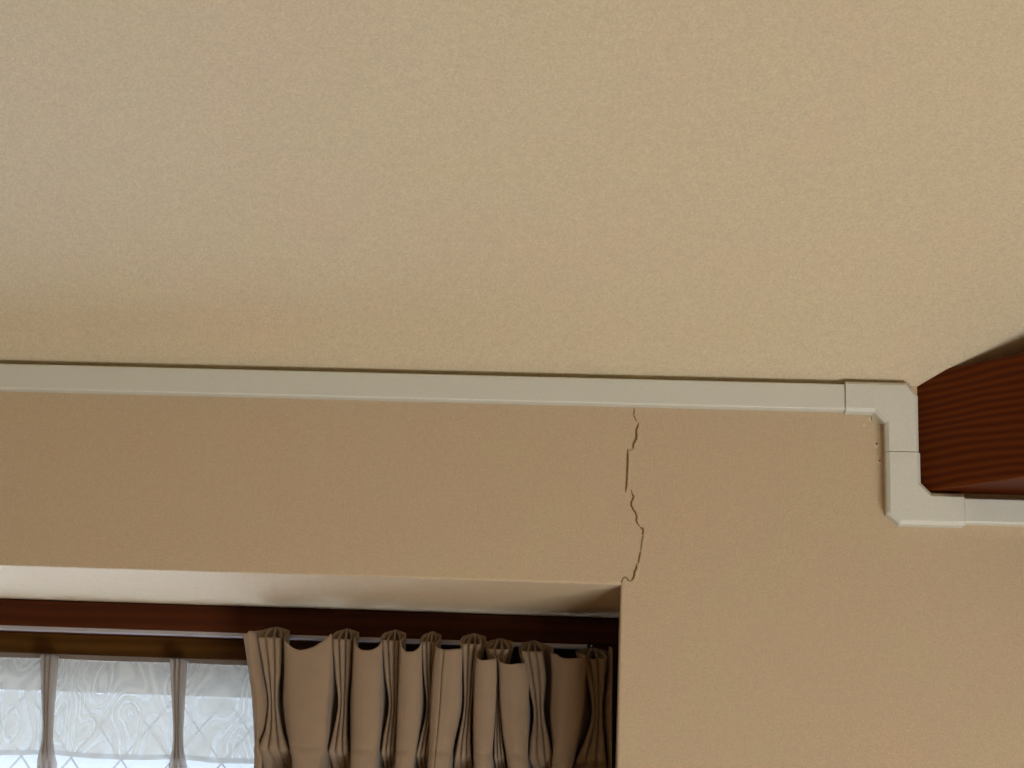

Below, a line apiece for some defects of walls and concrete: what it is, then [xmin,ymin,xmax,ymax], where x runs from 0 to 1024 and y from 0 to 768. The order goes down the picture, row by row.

crack [621,408,647,584]